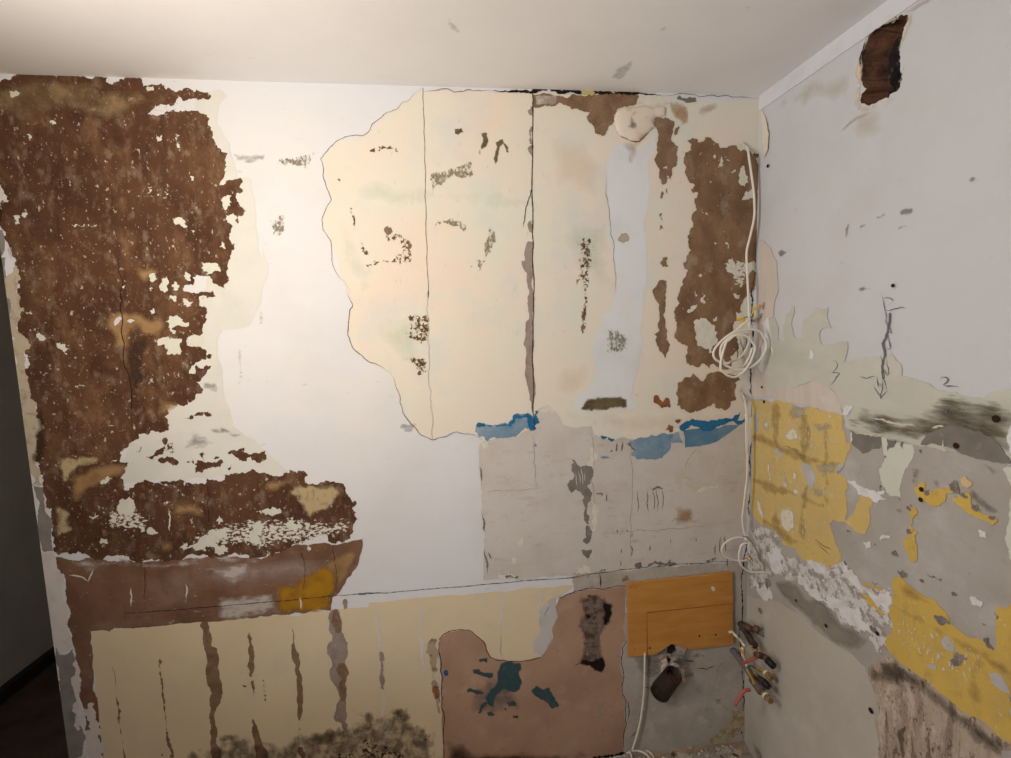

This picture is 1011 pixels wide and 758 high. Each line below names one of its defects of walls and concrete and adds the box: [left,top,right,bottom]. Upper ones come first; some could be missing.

spalling [856,15,910,110]
peeling [0,74,363,756]
peeling [320,88,1011,758]
leakage [158,659,174,758]
leakage [200,599,430,758]
leakage [580,596,612,672]
leakage [884,708,914,758]